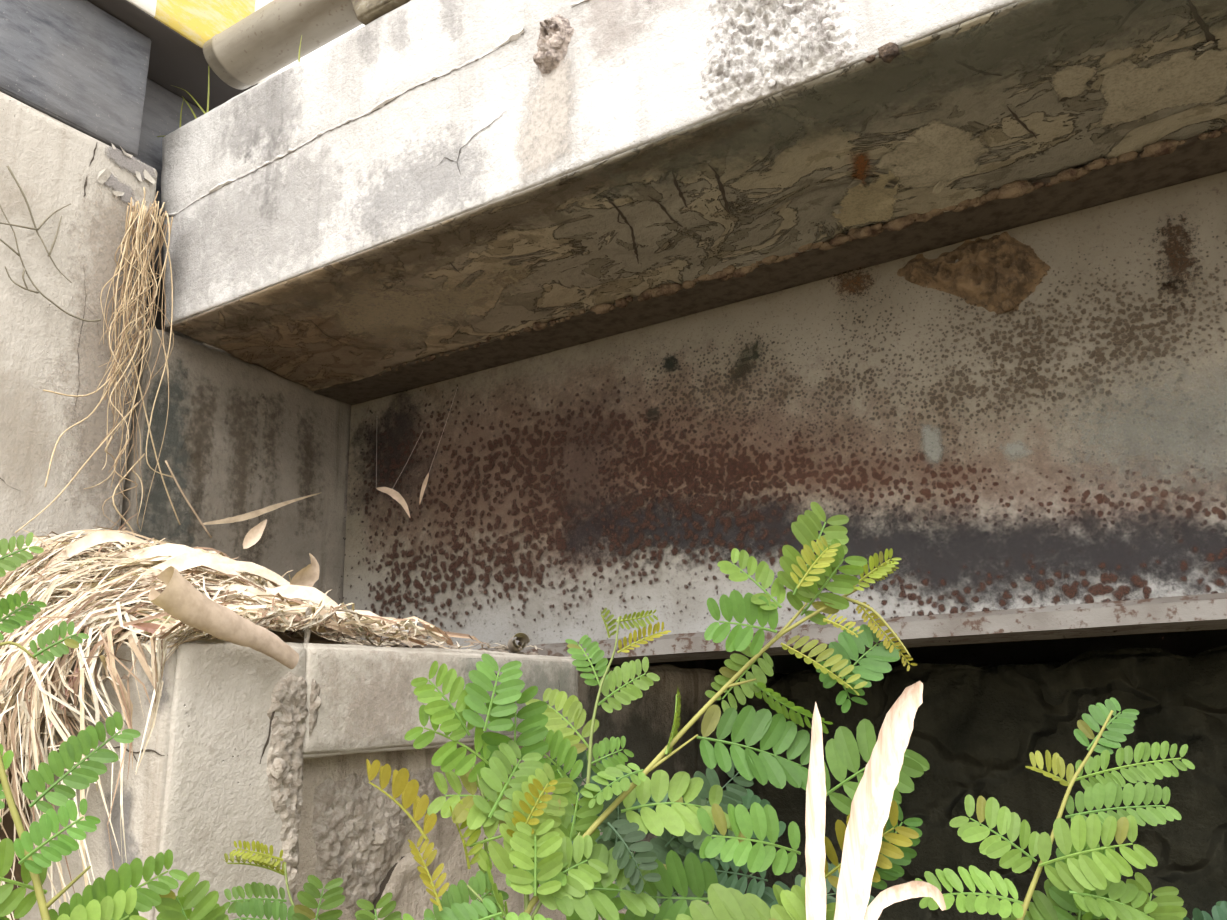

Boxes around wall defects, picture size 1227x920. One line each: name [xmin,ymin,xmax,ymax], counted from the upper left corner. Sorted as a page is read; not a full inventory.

peeling [97,143,156,206]
crack [168,33,523,217]
spalling [864,42,900,64]
peeling [1049,41,1227,127]
spalling [379,120,1227,376]
corrosion [339,214,1227,642]
water stain [564,493,1227,607]
spalling [304,604,312,643]
spalling [266,672,441,920]